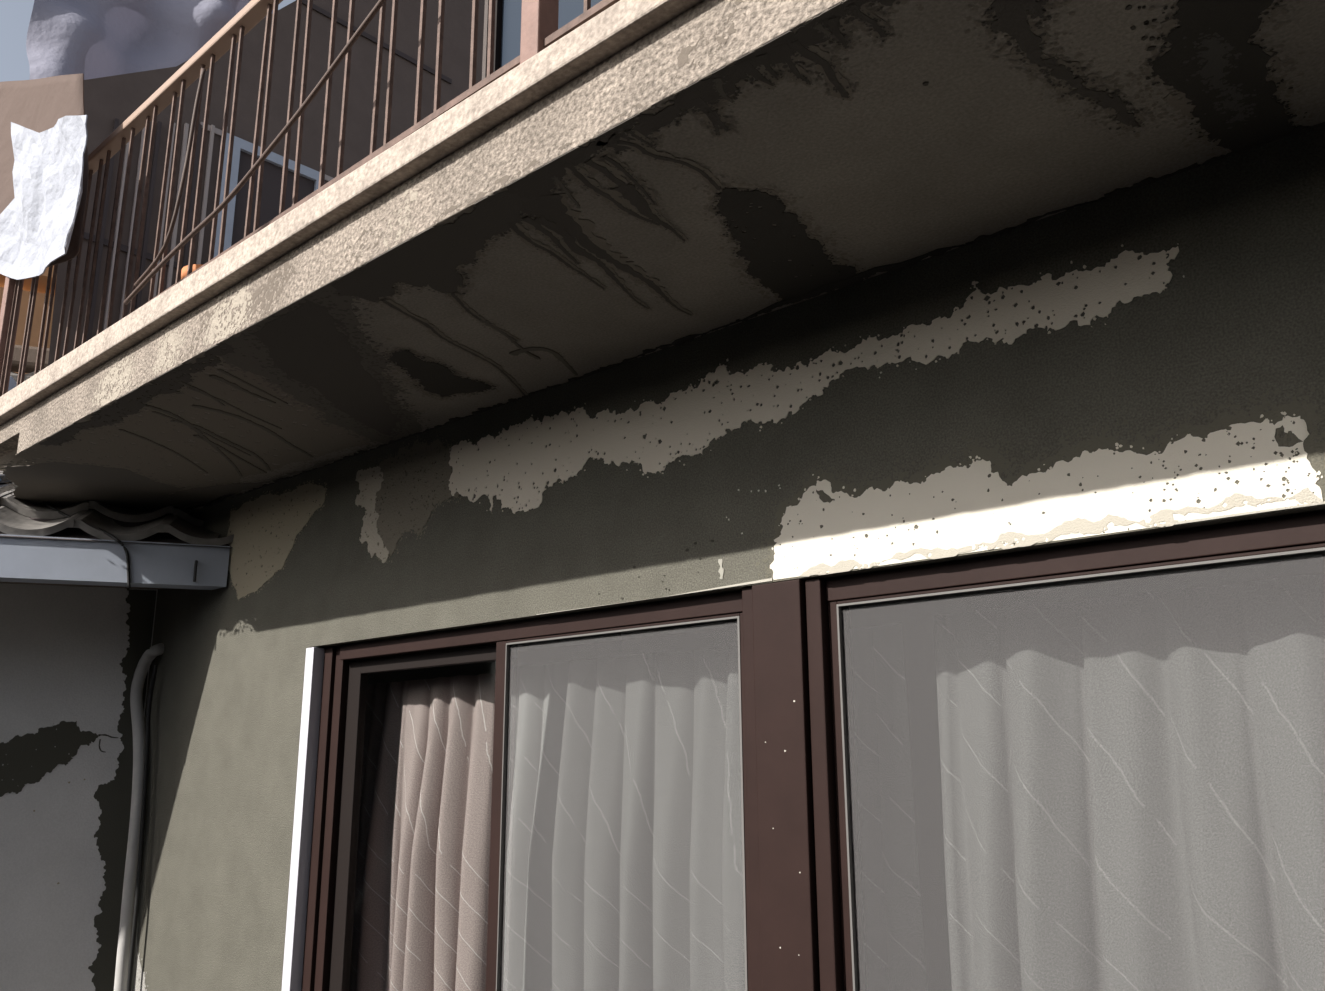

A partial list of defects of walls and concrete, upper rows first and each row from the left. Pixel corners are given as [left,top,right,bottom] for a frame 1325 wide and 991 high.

damp [964,0,1231,156]
damp [0,0,924,563]
peeling [448,243,1179,514]
flaking render [227,479,327,599]
peeling [355,466,389,563]
flaking render [134,951,148,991]